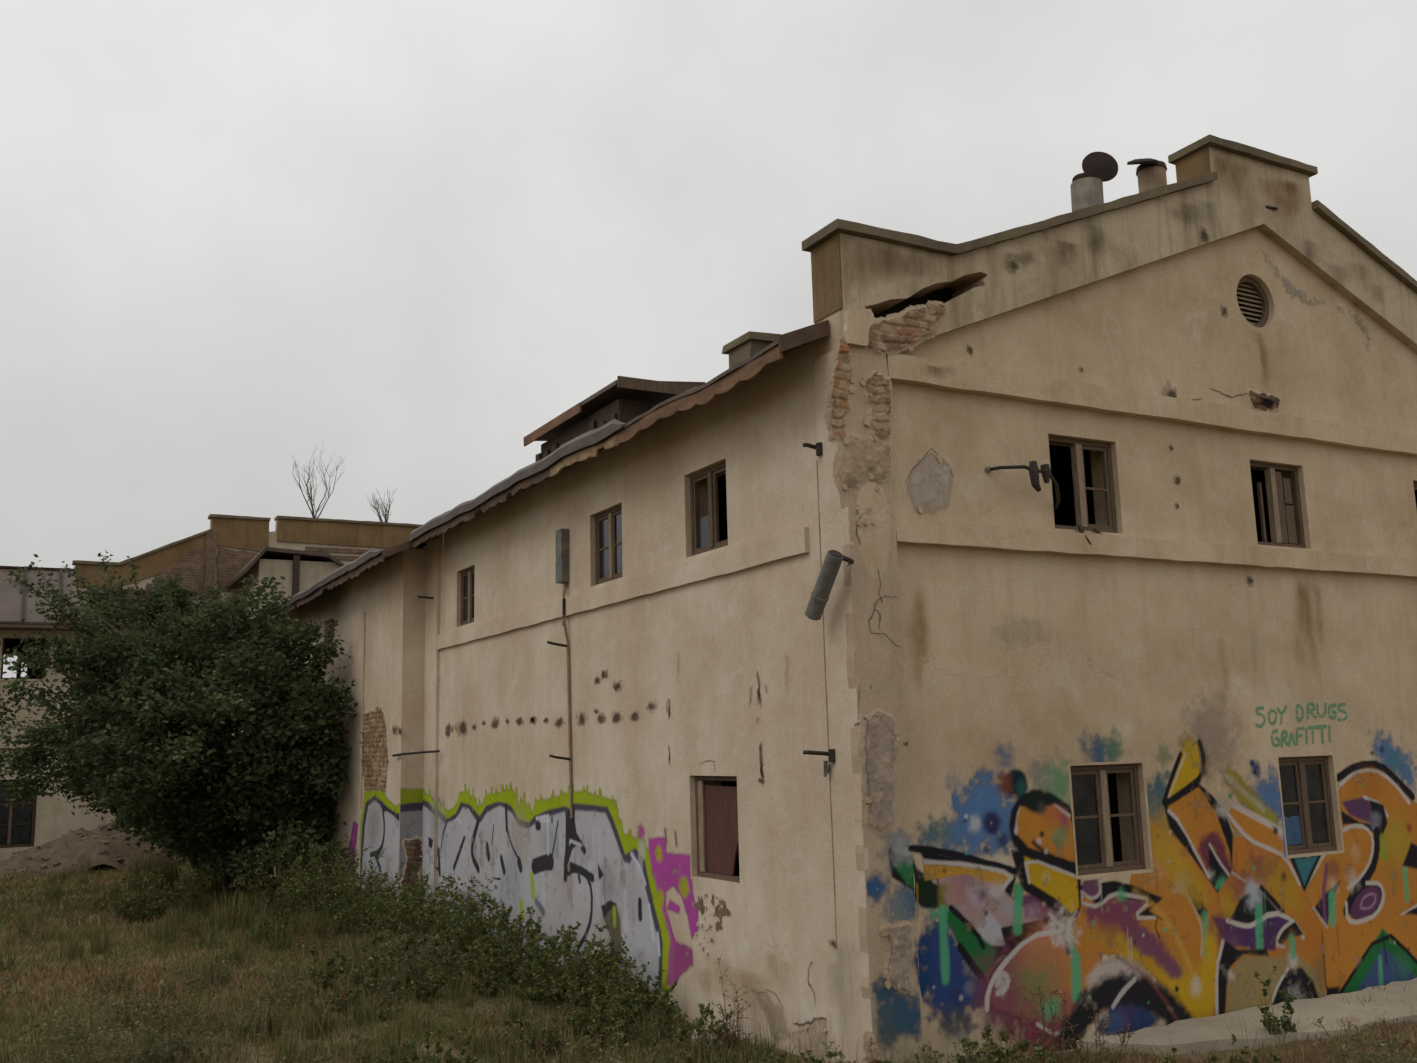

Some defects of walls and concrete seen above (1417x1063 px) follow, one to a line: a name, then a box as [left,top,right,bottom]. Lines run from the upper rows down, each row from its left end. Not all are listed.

spalling [823,300,957,526]
spalling [1245,387,1280,413]
crack [856,513,899,647]
spalling [360,704,404,793]
spalling [445,701,656,737]
spalling [594,669,621,692]
spalling [858,705,908,837]